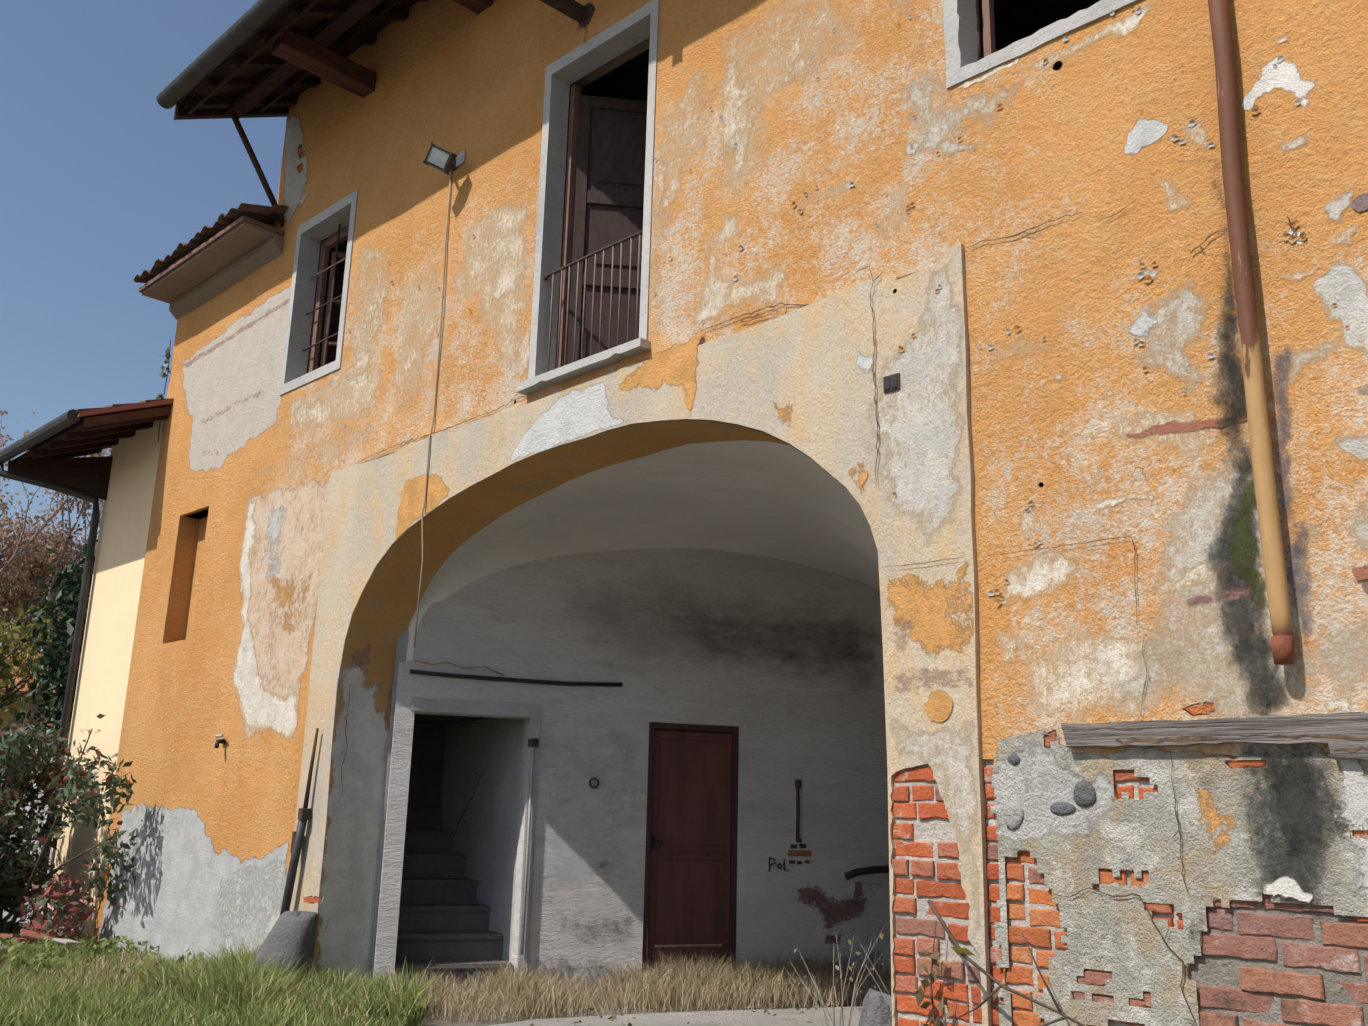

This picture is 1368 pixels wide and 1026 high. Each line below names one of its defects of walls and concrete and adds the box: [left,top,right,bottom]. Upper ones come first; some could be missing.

crack [972,200,1135,246]
flaking render [182,203,530,472]
crack [692,303,809,335]
peeling [856,264,964,542]
leakage [1208,257,1285,715]
leakage [1272,348,1292,514]
leakage [1287,525,1310,632]
peeling [98,803,288,963]
crack [1054,888,1196,1026]
flaking render [887,458,1368,1026]
crack [1170,751,1189,894]
leakage [1243,747,1347,908]